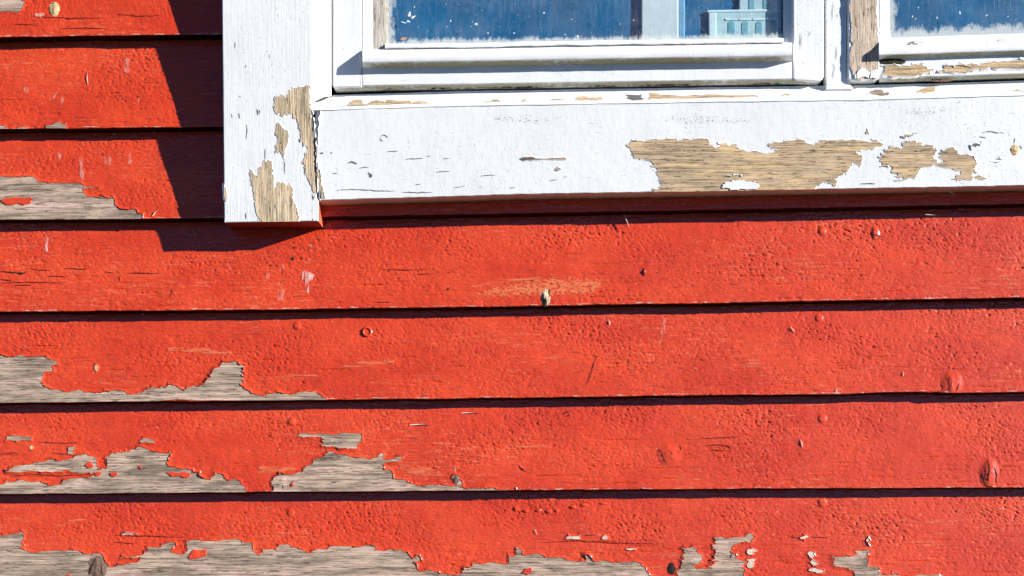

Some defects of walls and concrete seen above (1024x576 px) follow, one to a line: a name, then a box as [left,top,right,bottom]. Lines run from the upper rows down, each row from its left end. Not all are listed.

peeling [848,0,1024,97]
peeling [249,83,326,222]
peeling [625,128,988,192]
peeling [0,173,146,219]
peeling [0,351,328,403]
peeling [0,433,248,494]
peeling [269,430,517,492]
peeling [0,528,653,576]
peeling [674,530,760,576]
peeling [798,533,941,576]